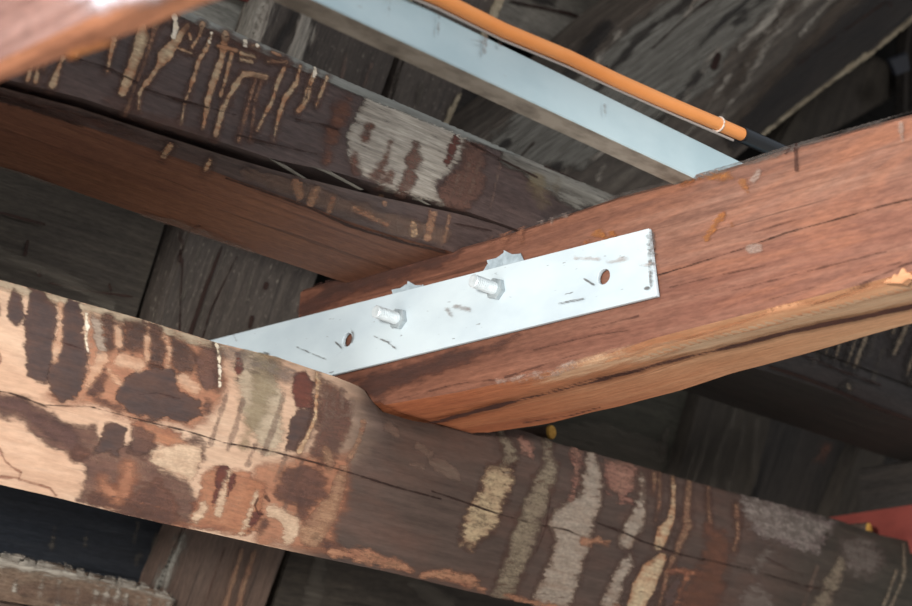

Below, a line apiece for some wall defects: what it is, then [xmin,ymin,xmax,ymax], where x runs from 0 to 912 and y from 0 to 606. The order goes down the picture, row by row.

crack [67,55,317,155]
crack [470,142,579,181]
crack [787,143,798,171]
crack [733,198,912,273]
crack [428,252,912,423]
crack [0,391,67,407]
crack [92,407,831,591]